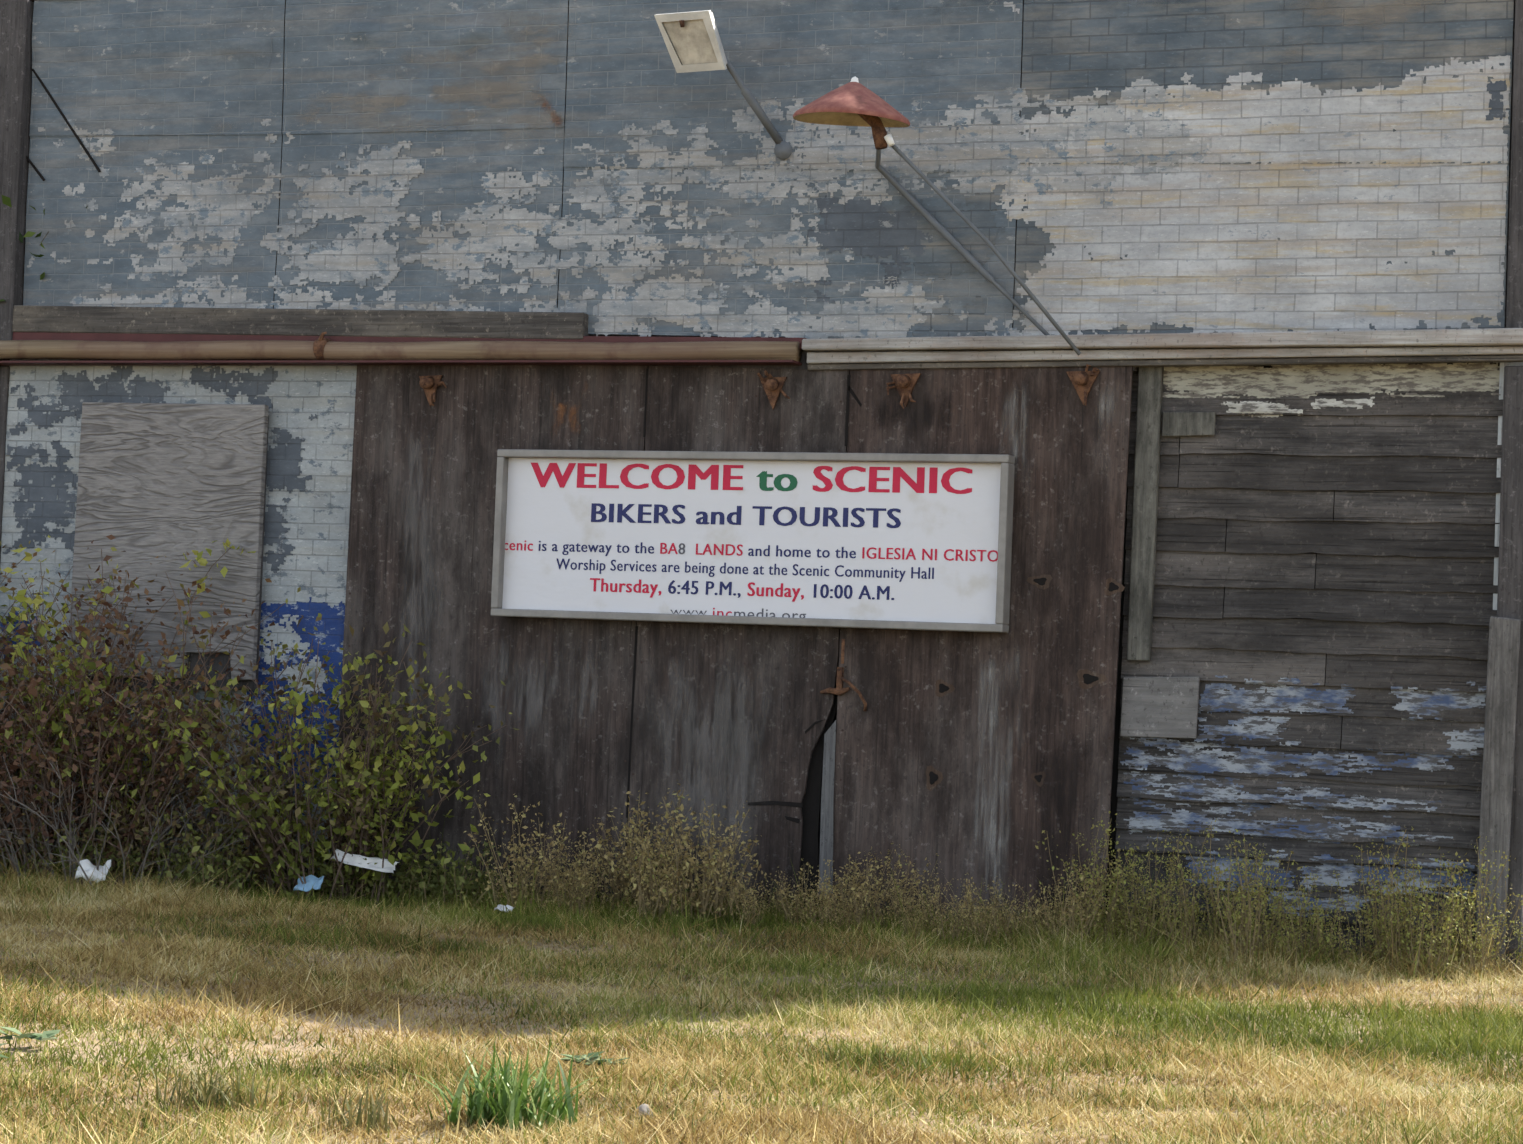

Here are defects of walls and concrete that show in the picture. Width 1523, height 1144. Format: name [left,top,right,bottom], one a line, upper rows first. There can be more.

peeling [27,55,1511,339]
peeling [3,366,170,554]
peeling [189,365,278,409]
peeling [263,427,312,574]
peeling [260,614,327,695]
crack [748,695,838,897]
peeling [1105,675,1486,919]